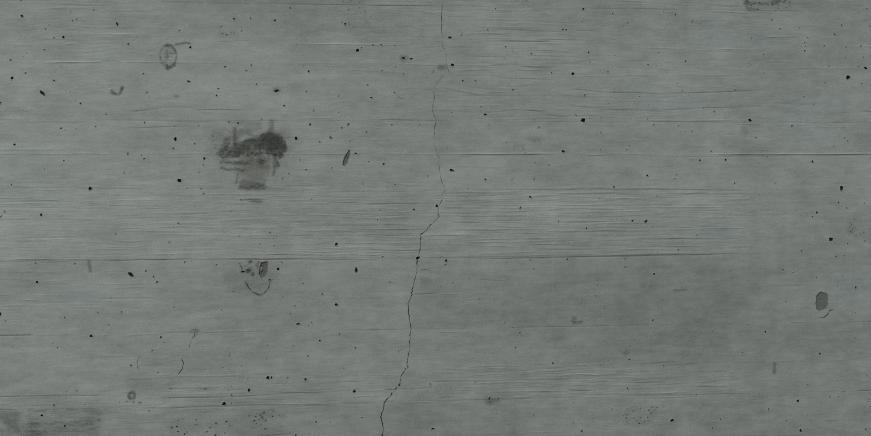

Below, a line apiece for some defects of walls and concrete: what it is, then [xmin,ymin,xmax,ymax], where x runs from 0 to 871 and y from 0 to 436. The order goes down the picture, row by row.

damp [220,132,287,163]
crack [380,12,449,436]